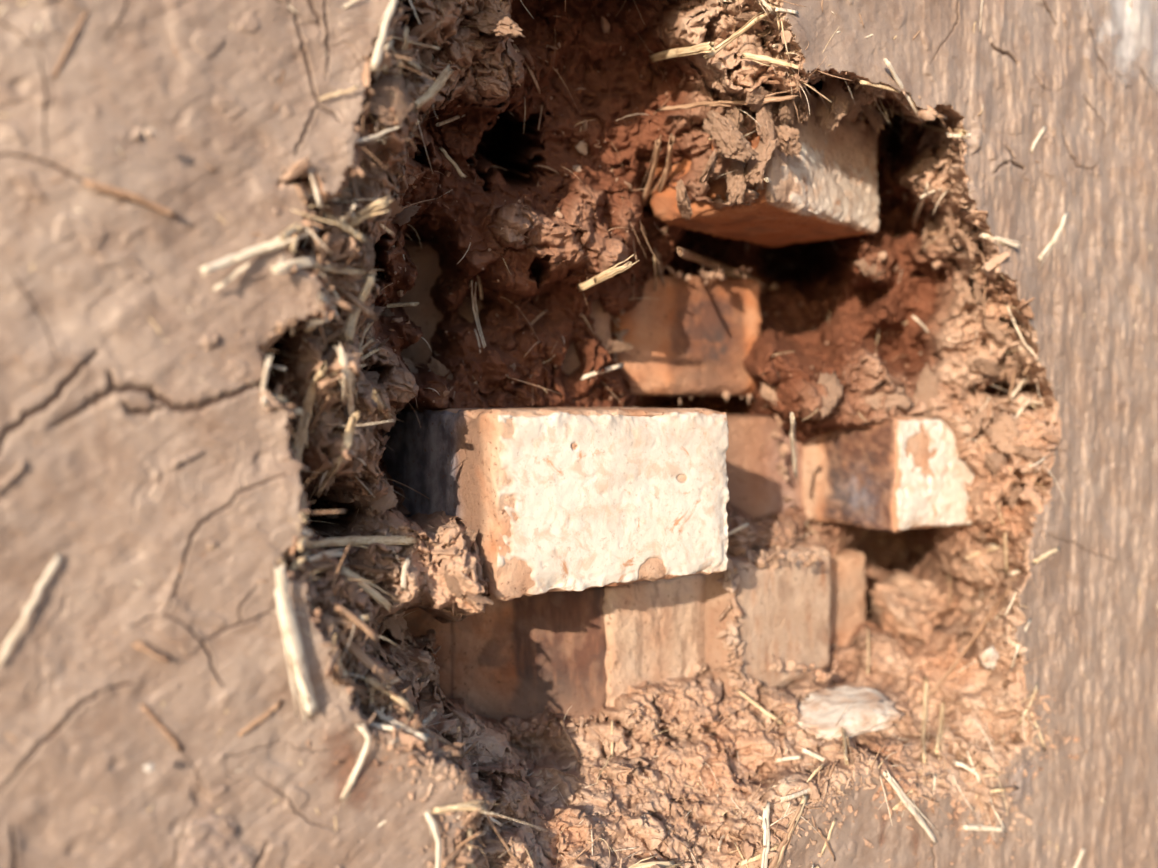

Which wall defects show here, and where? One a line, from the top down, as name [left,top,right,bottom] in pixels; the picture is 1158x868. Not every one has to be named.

crack [0,20,83,181]
crack [277,0,341,156]
crack [992,147,1024,174]
crack [991,44,1052,91]
crack [1061,96,1106,170]
crack [1085,1,1154,89]
crack [0,271,262,451]
spalling [255,0,1085,868]
crack [128,473,287,687]
crack [0,682,135,793]
crack [9,824,17,868]
crack [170,739,351,868]